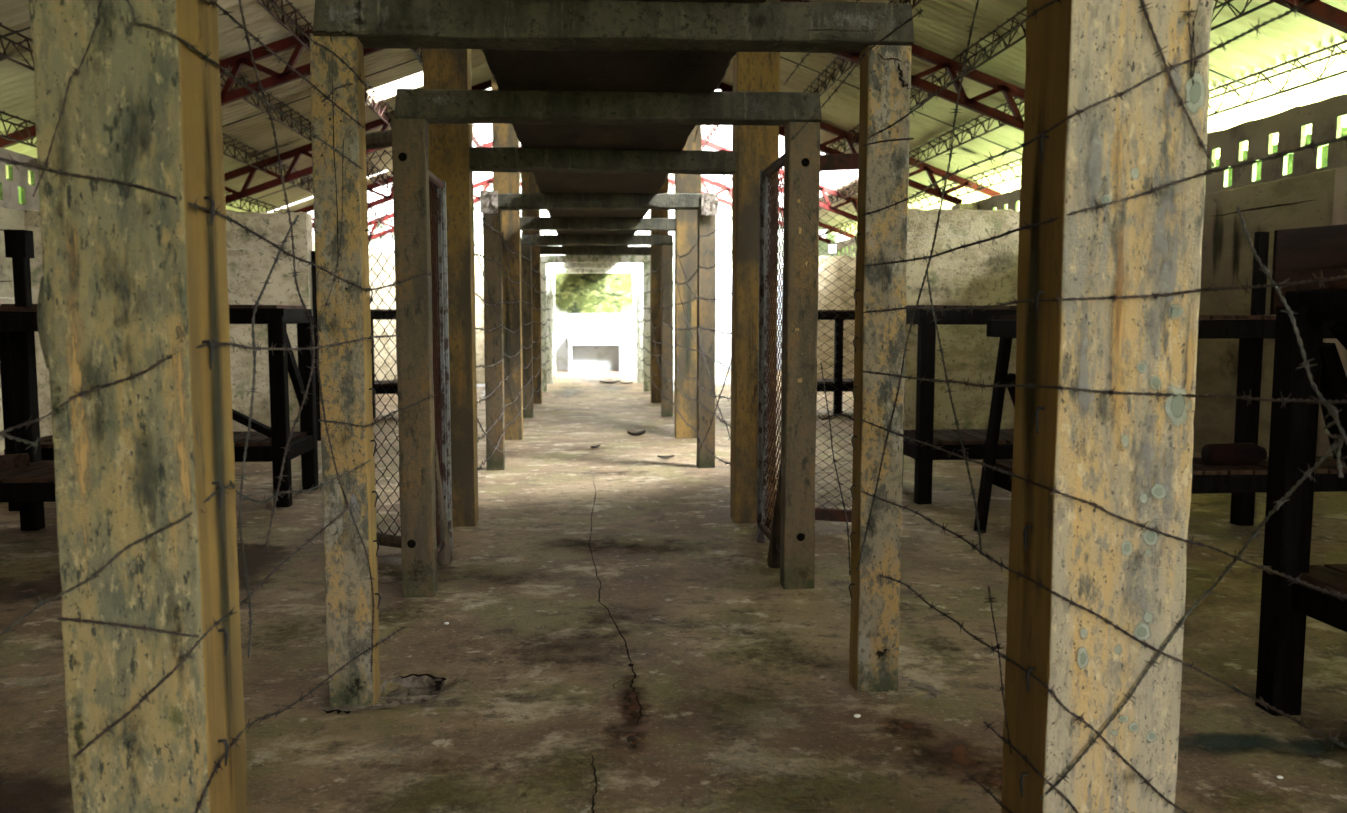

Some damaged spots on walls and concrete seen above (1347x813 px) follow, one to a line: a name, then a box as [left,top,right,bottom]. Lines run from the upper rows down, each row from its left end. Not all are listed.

leakage [172,329,191,505]
leakage [1099,270,1128,419]
leakage [1186,310,1194,403]
crack [589,478,642,726]